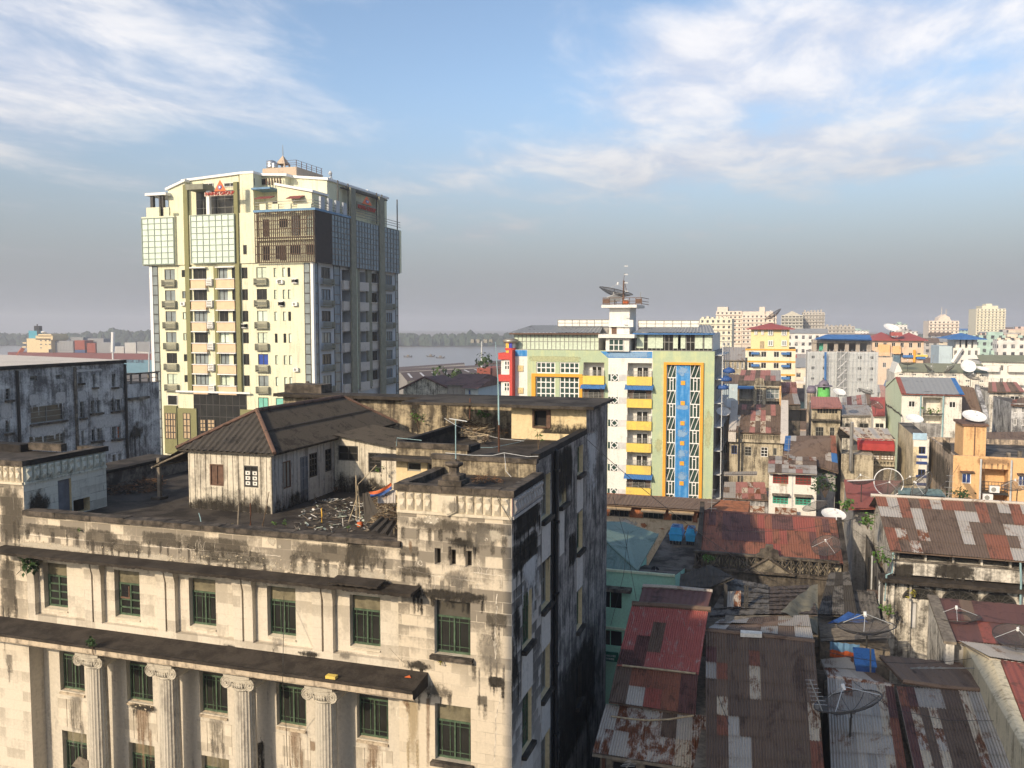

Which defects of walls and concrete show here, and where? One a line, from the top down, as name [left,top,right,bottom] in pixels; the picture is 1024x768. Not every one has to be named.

water stain [541,424,598,523]
water stain [0,489,277,617]
water stain [291,543,385,576]
water stain [569,532,588,568]
water stain [398,503,552,761]
water stain [558,626,596,768]